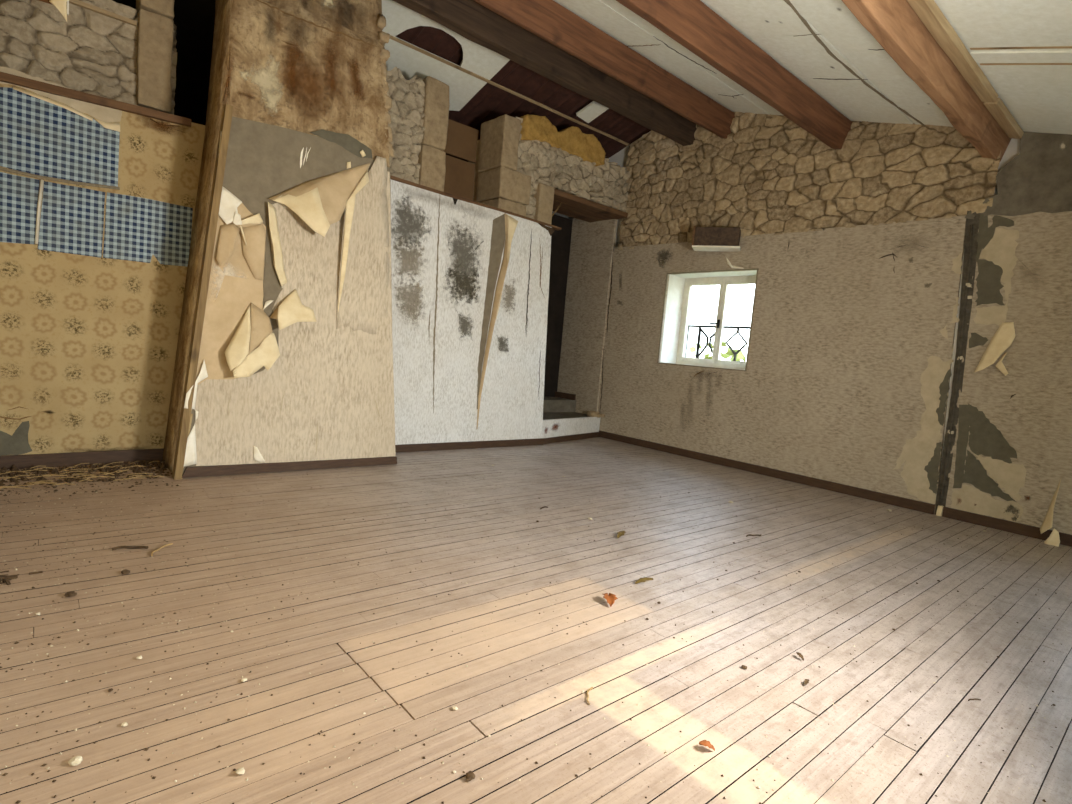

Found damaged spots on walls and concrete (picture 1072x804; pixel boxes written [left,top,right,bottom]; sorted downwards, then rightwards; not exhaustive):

damp [287,47,336,105]
damp [351,62,361,96]
peeling [216,212,283,310]
peeling [272,188,330,237]
damp [391,197,432,324]
damp [443,222,482,303]
damp [458,314,472,339]
peeling [477,213,506,409]
damp [503,281,516,312]
peeling [969,215,1019,348]
peeling [892,297,960,504]
flaking render [951,404,1027,522]